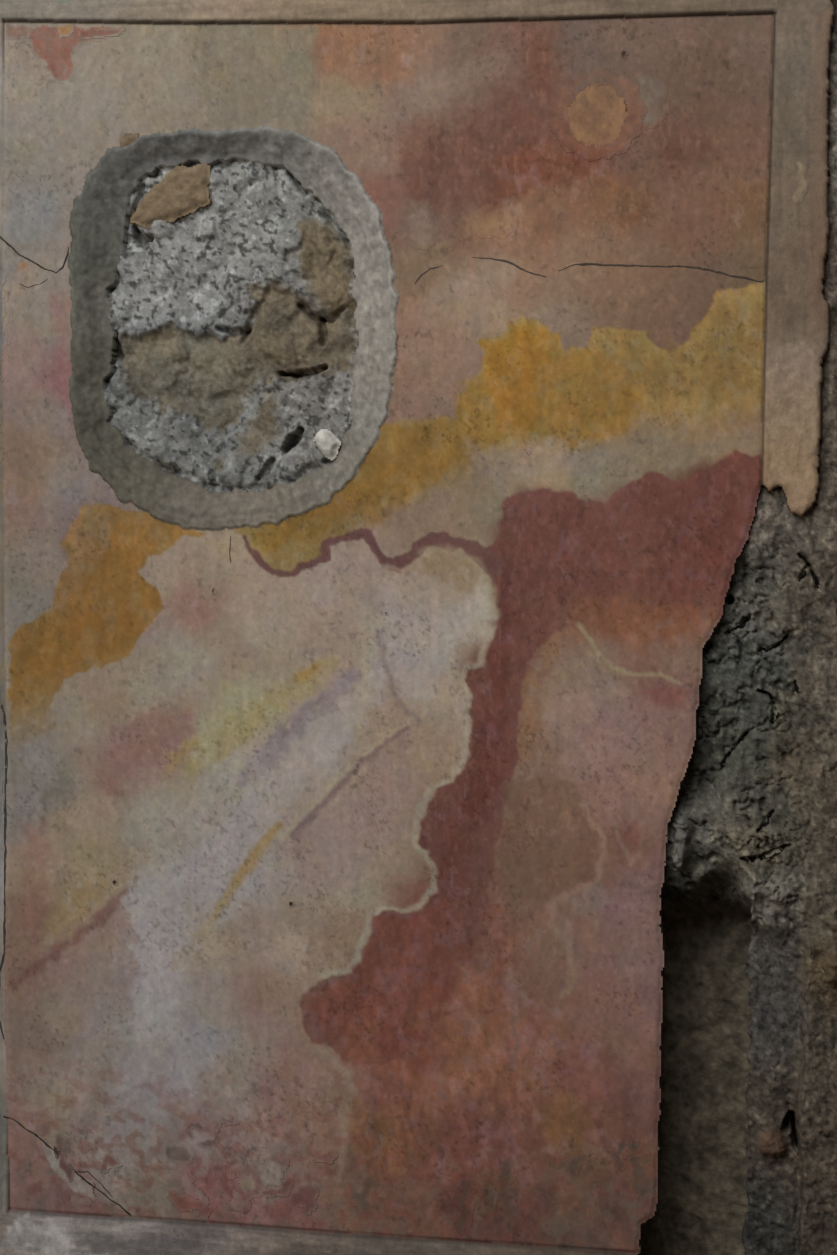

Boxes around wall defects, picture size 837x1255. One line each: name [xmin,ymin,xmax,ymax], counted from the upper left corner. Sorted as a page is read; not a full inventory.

crack [0,236,69,288]
crack [473,257,764,282]
spalling [68,126,400,531]
flaking render [642,0,837,1255]
crack [3,1116,132,1216]